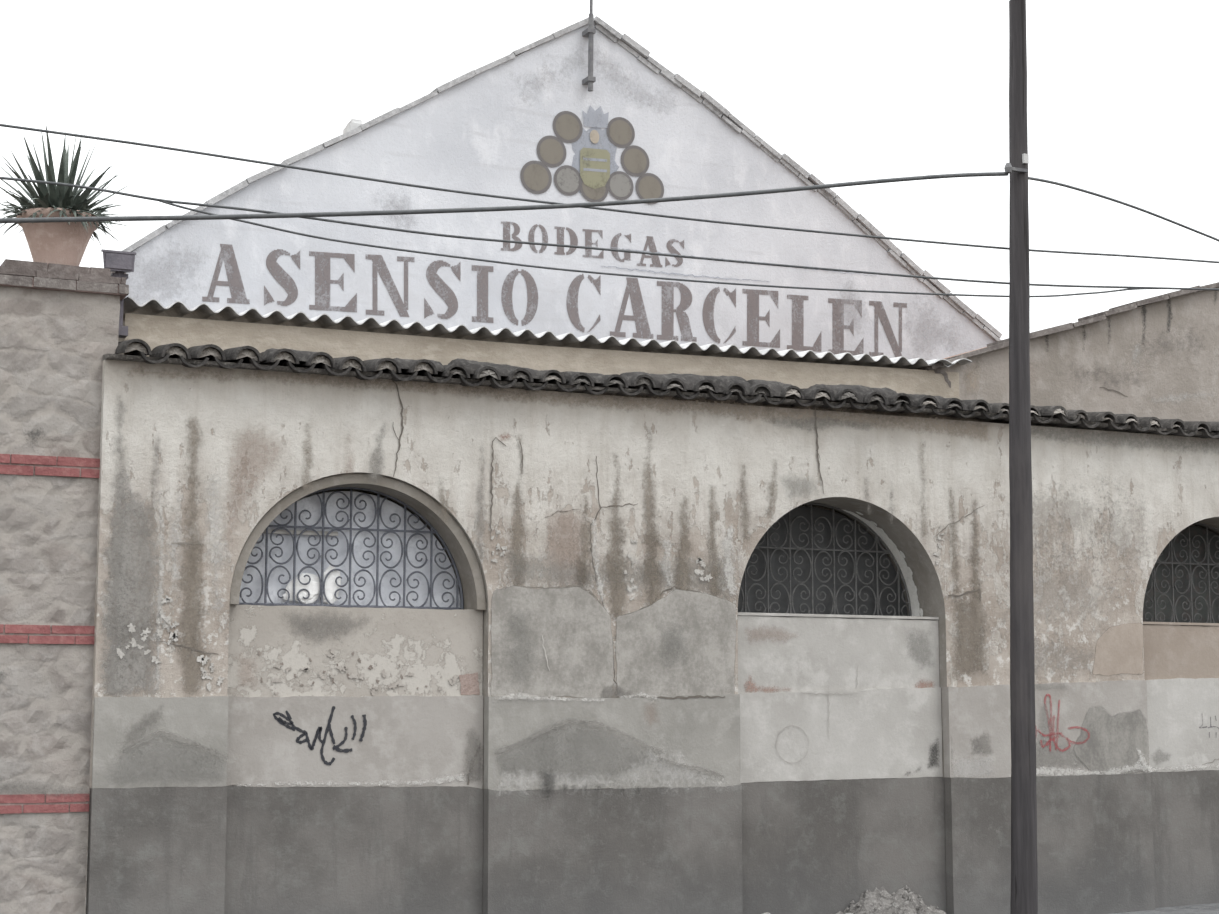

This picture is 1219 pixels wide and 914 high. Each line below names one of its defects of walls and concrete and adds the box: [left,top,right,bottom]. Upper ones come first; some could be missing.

leakage [102,439,155,694]
flaking render [116,492,179,689]
leakage [180,421,205,691]
crack [392,380,404,477]
crack [490,437,523,536]
crack [497,456,719,684]
leakage [606,494,626,617]
leakage [644,464,661,606]
crack [814,406,824,493]
leakage [951,503,984,675]
flaking render [196,655,225,692]
flaking render [260,647,480,697]